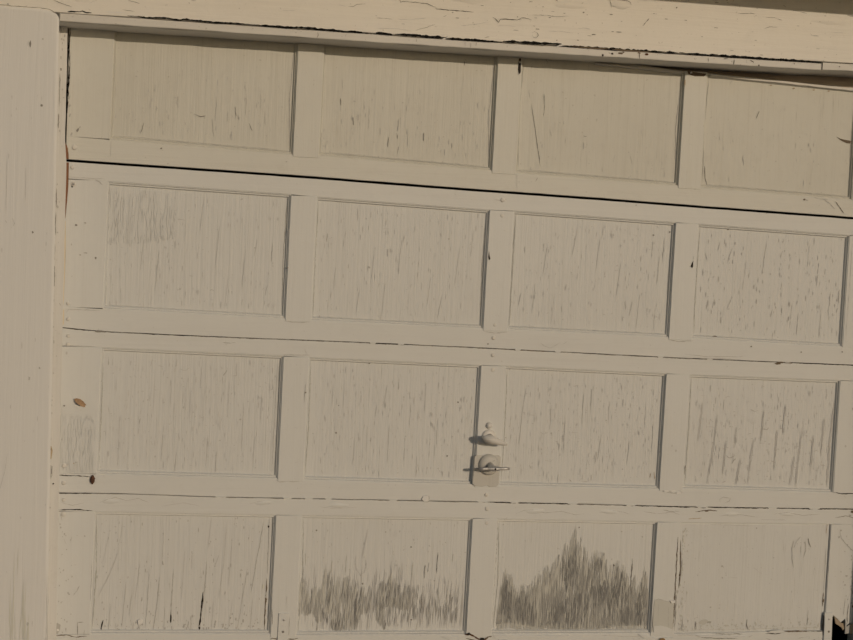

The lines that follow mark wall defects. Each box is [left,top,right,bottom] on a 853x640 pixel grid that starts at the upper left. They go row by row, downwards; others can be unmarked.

crack [126,0,853,68]